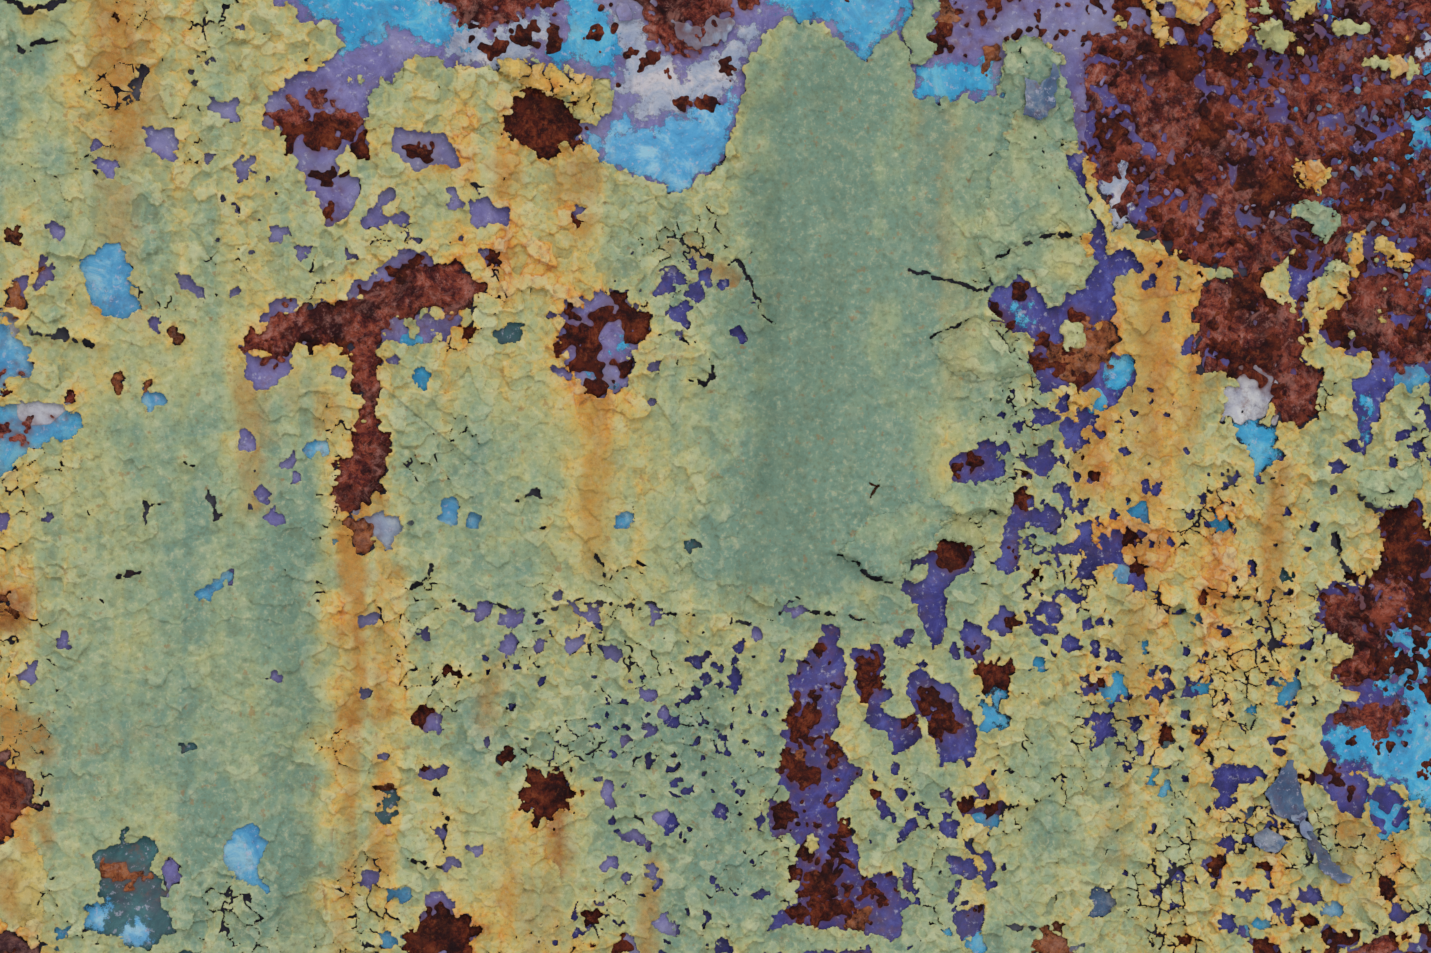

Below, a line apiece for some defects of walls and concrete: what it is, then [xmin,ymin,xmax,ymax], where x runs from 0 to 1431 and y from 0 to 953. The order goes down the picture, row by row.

corrosion [616,0,760,58]
spalling [4,224,23,246]
peeling [0,242,184,477]
corrosion [546,280,683,398]
corrosion [1066,0,1431,616]
corrosion [238,248,488,647]
spalling [1186,470,1284,534]
peeling [1328,364,1431,522]
corrosion [0,708,49,842]
peeling [1147,567,1431,953]
peeling [223,823,270,894]
corrosion [0,930,39,953]